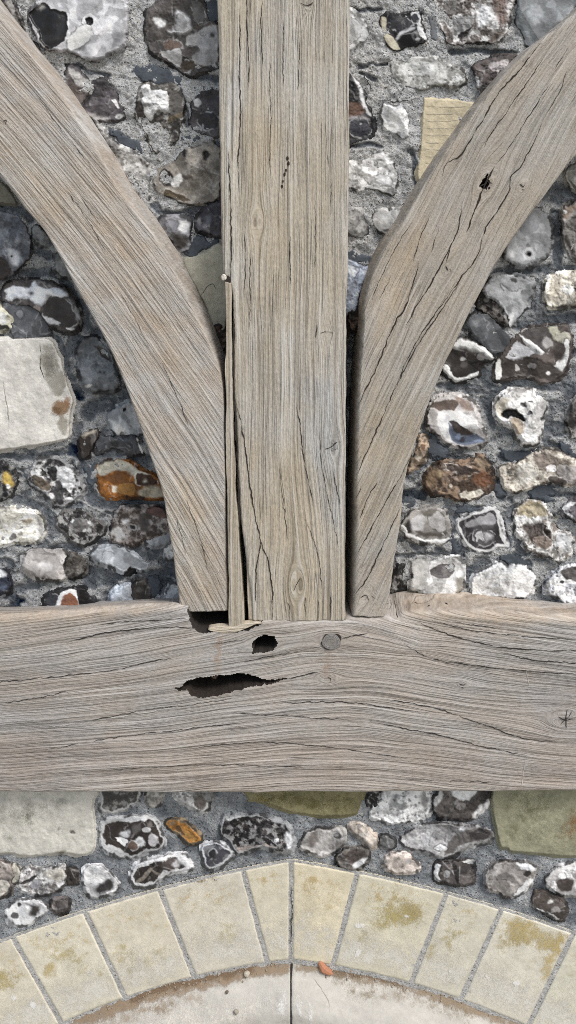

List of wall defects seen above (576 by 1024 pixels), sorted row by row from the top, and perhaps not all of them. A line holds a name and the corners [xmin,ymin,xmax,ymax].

crack [203,0,567,618]
crack [34,633,553,783]